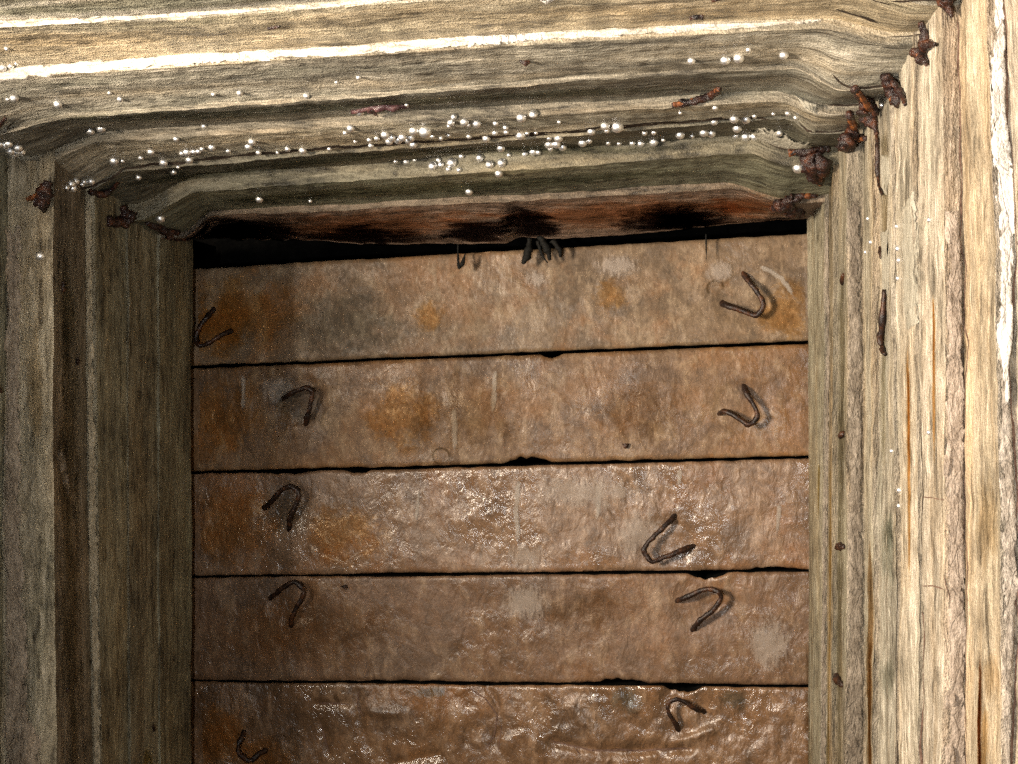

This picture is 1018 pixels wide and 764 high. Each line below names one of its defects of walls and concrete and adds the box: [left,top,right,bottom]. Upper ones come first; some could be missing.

damp [185,207,560,246]
damp [613,204,738,232]